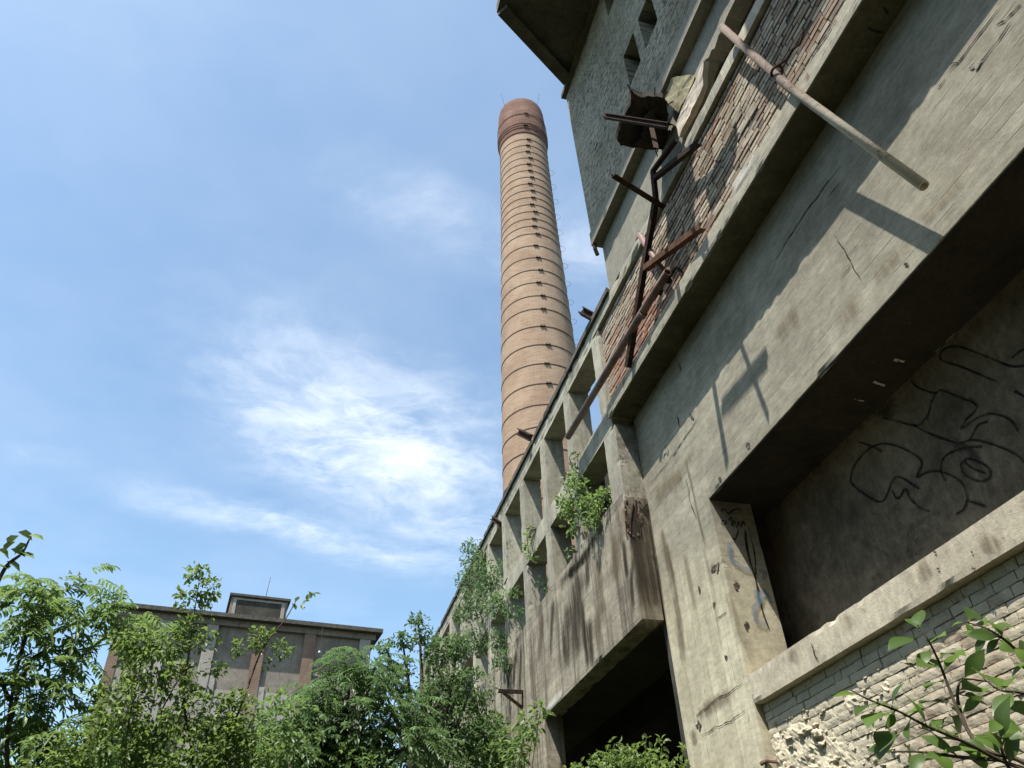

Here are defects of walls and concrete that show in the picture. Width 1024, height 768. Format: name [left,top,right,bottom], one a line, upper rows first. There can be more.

crack [937,4,1020,89]
crack [775,168,839,259]
damp [538,530,602,664]
damp [613,502,683,643]
damp [506,650,521,688]